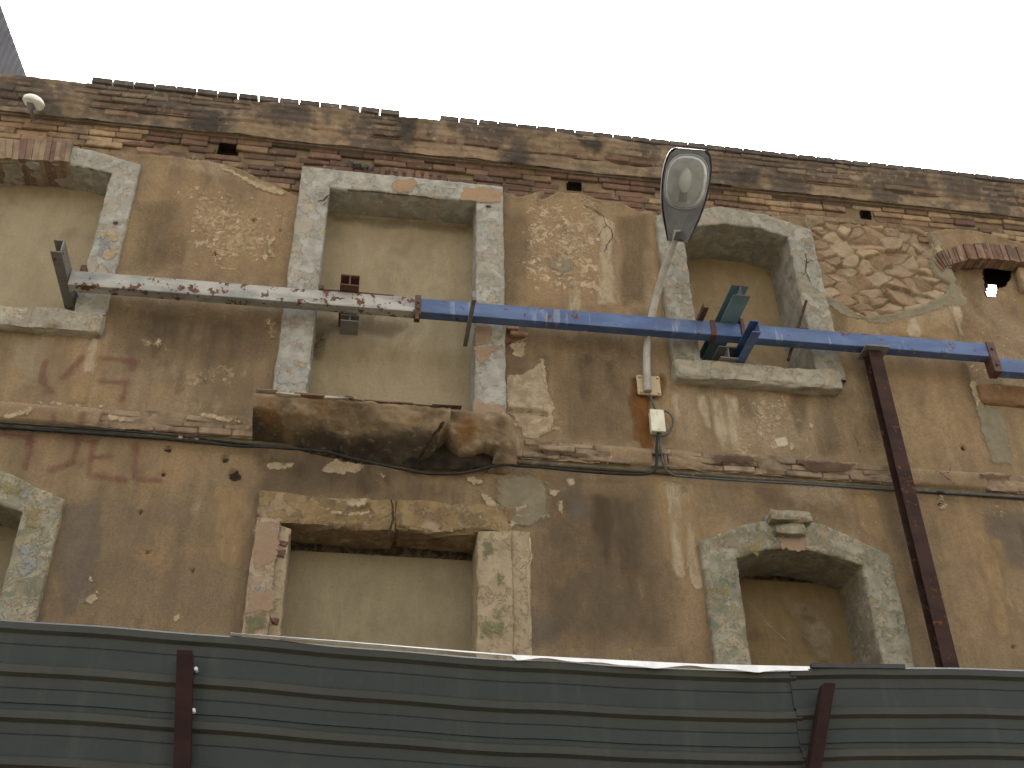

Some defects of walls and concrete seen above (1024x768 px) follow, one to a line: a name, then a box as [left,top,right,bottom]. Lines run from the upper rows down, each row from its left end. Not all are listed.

spalling [0,115,662,275]
crack [584,205,616,252]
spalling [704,191,1024,319]
peeling [474,324,528,367]
flaking render [322,458,365,475]
spalling [473,358,631,466]
rust [630,379,652,448]
damp [657,482,702,589]